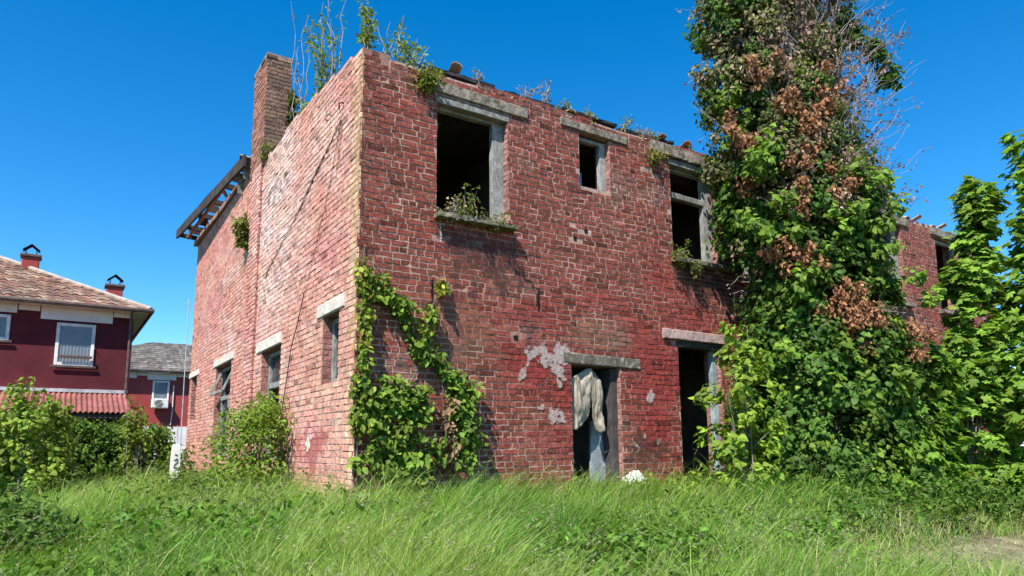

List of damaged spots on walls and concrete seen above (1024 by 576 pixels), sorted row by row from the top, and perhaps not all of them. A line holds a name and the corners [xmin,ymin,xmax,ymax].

spalling [513,335,570,388]
spalling [538,404,566,424]